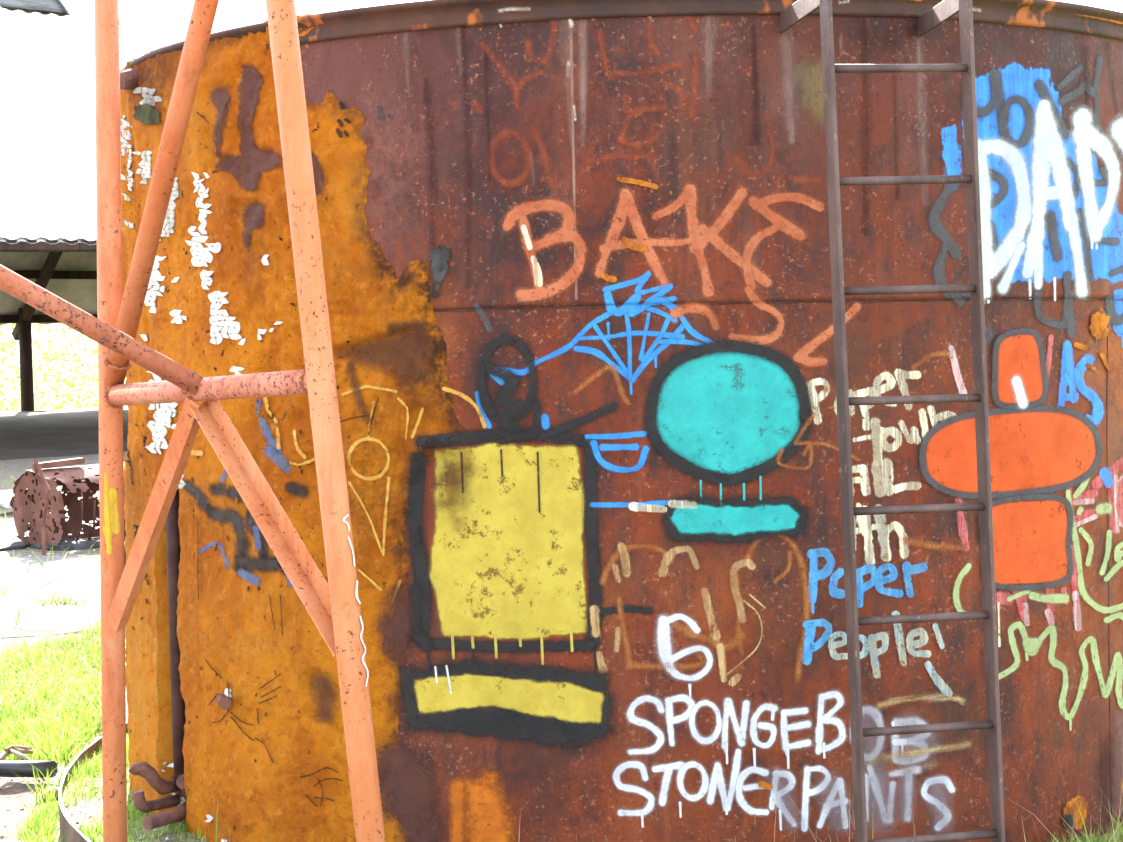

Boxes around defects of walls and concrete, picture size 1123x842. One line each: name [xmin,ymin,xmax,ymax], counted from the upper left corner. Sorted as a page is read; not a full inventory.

peeling [133,87,163,107]
peeling [120,115,152,201]
peeling [160,65,283,346]
peeling [144,256,187,324]
peeling [145,403,179,454]
rust [450,772,515,842]